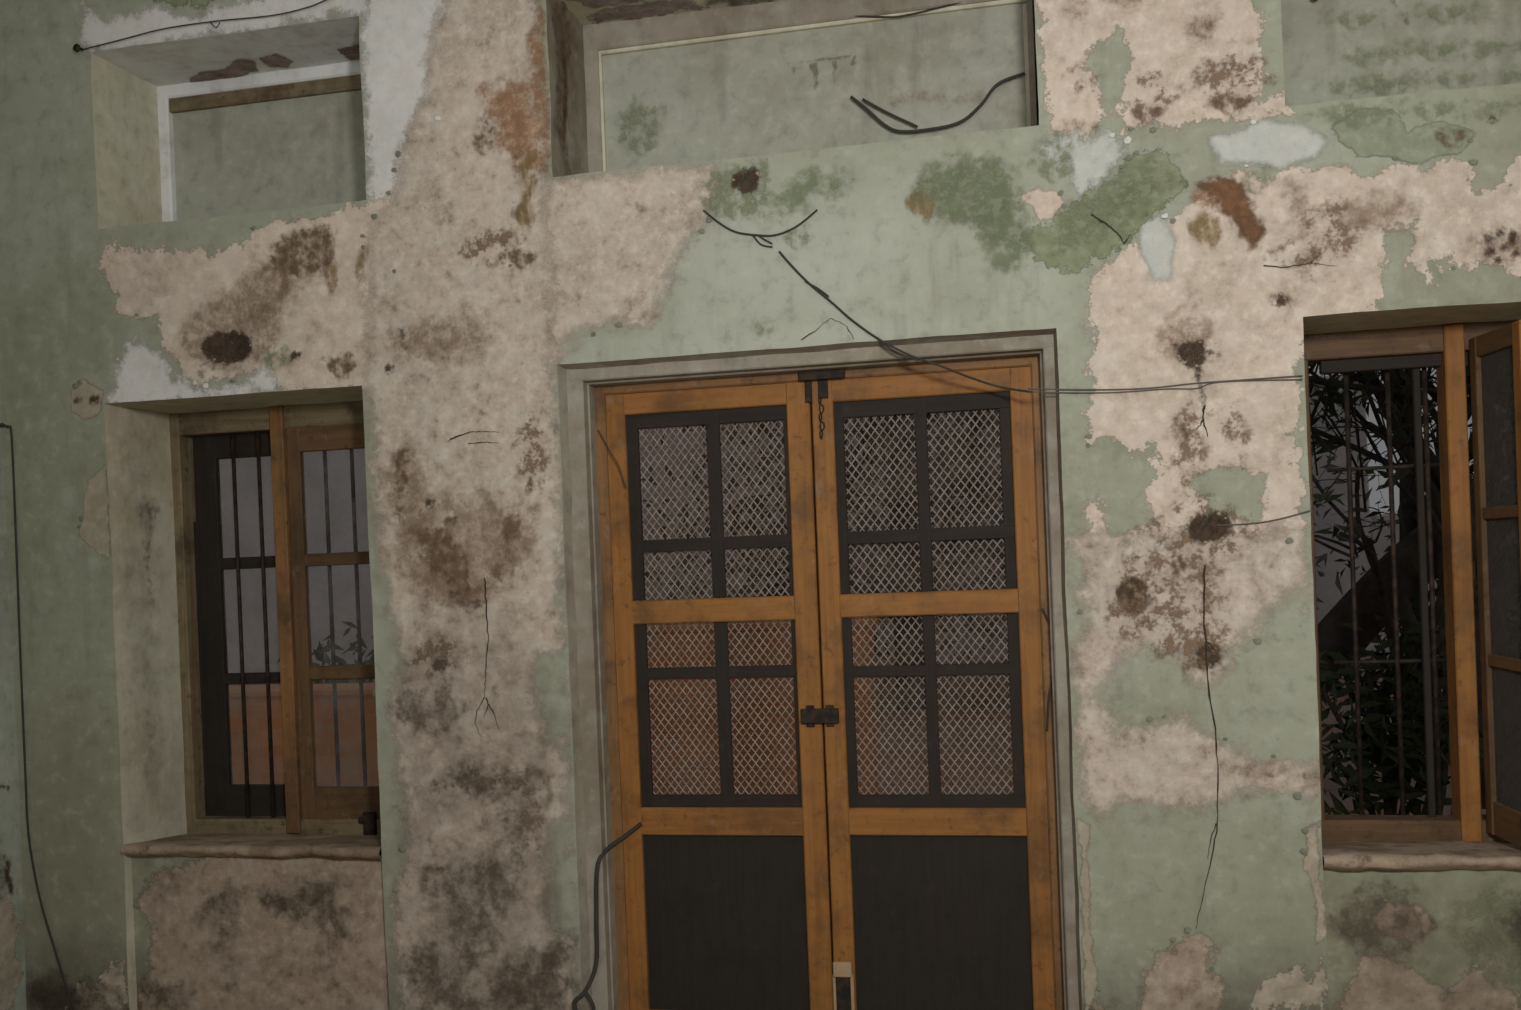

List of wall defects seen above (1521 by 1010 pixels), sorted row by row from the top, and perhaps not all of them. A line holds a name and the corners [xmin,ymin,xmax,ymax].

corrosion [474,2,578,224]
corrosion [510,252,534,269]
leakage [906,154,1029,271]
corrosion [1188,173,1267,248]
peeling [65,0,768,1010]
leakage [392,448,529,608]
leakage [519,419,548,491]
peeling [1019,0,1521,1010]
crack [475,578,499,736]
leakage [1106,552,1229,671]
crack [1195,565,1219,929]
leakage [407,860,568,1010]